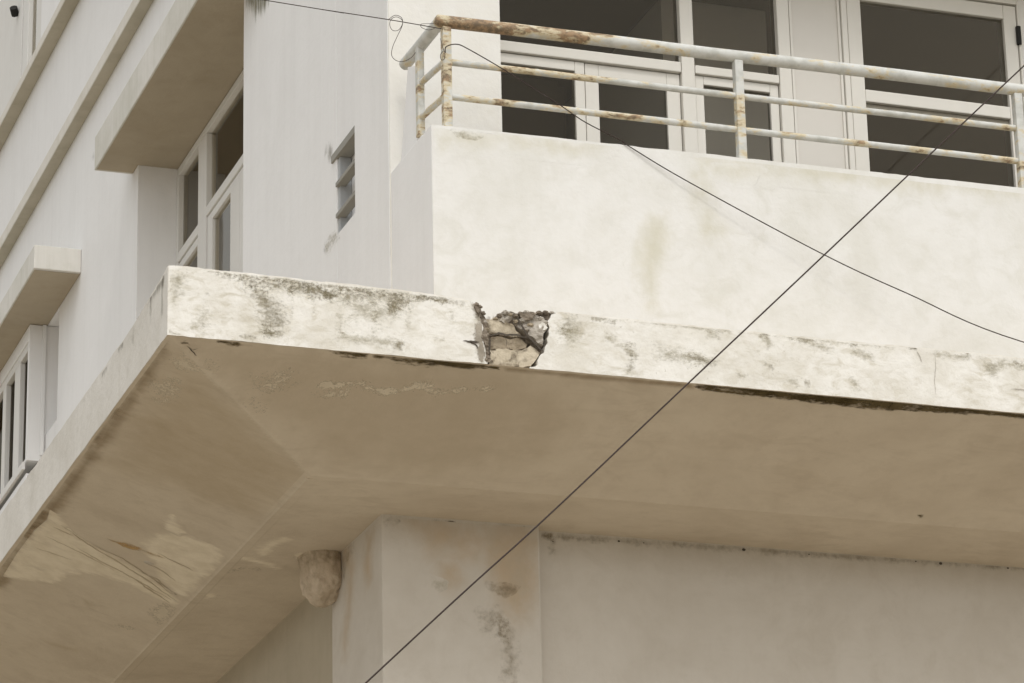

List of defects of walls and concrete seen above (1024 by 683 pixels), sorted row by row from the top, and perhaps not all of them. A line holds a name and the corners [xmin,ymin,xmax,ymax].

spalling [473,302,554,368]
damp [78,296,618,527]
peeling [0,507,230,607]